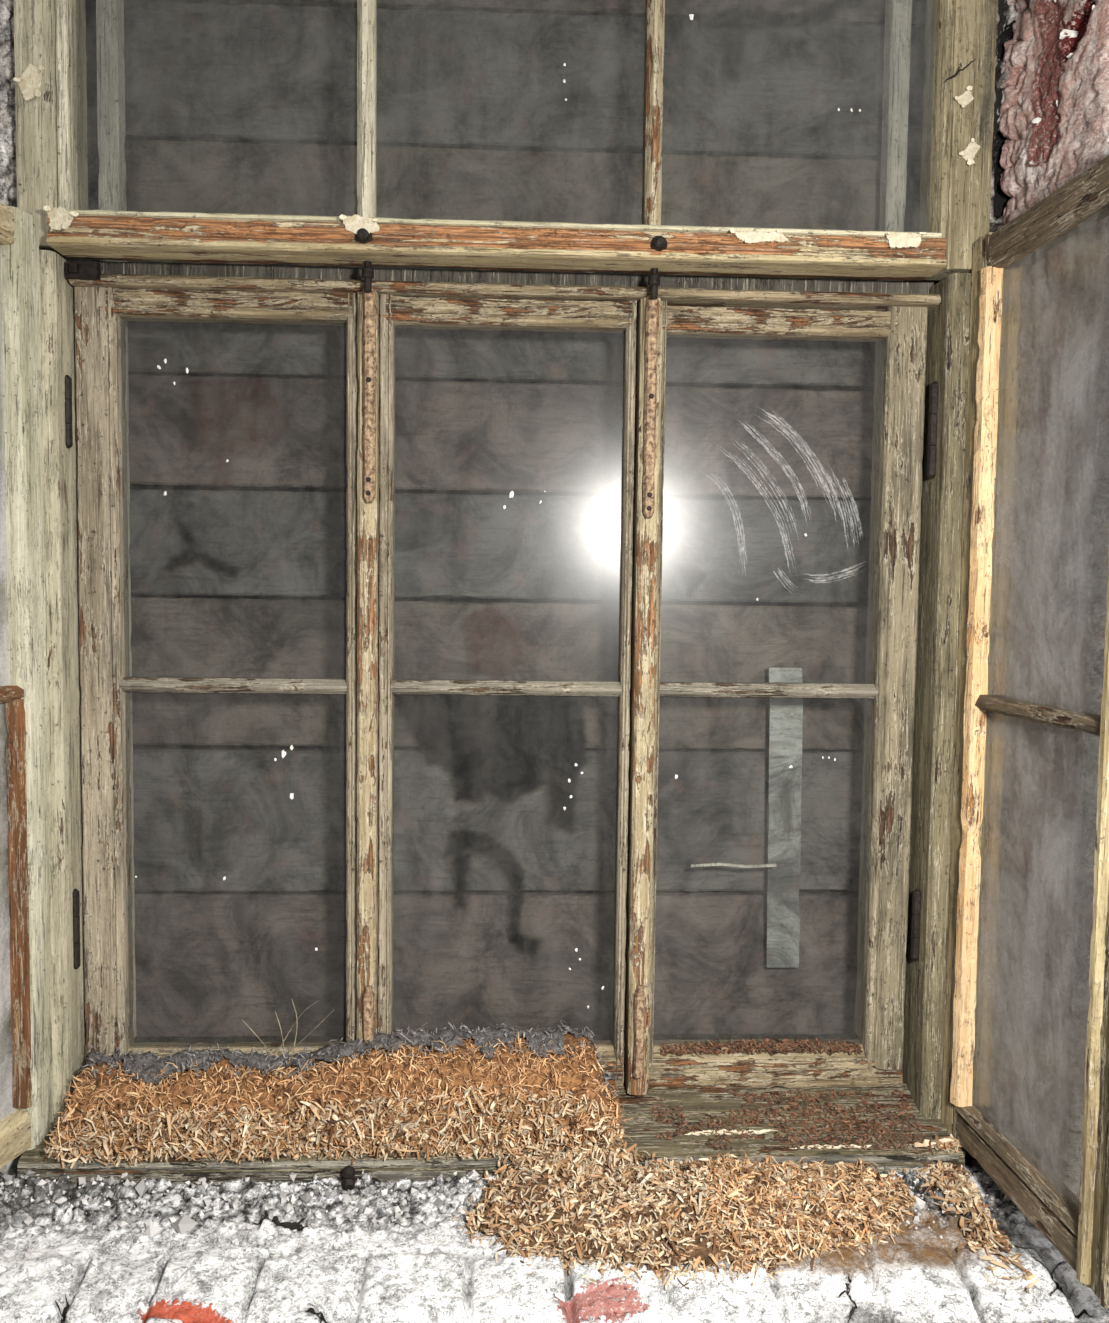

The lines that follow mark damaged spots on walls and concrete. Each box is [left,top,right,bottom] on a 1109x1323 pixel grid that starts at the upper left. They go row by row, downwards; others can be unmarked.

spalling [1026,0,1096,168]
spalling [138,1296,234,1323]
spalling [554,1277,650,1323]